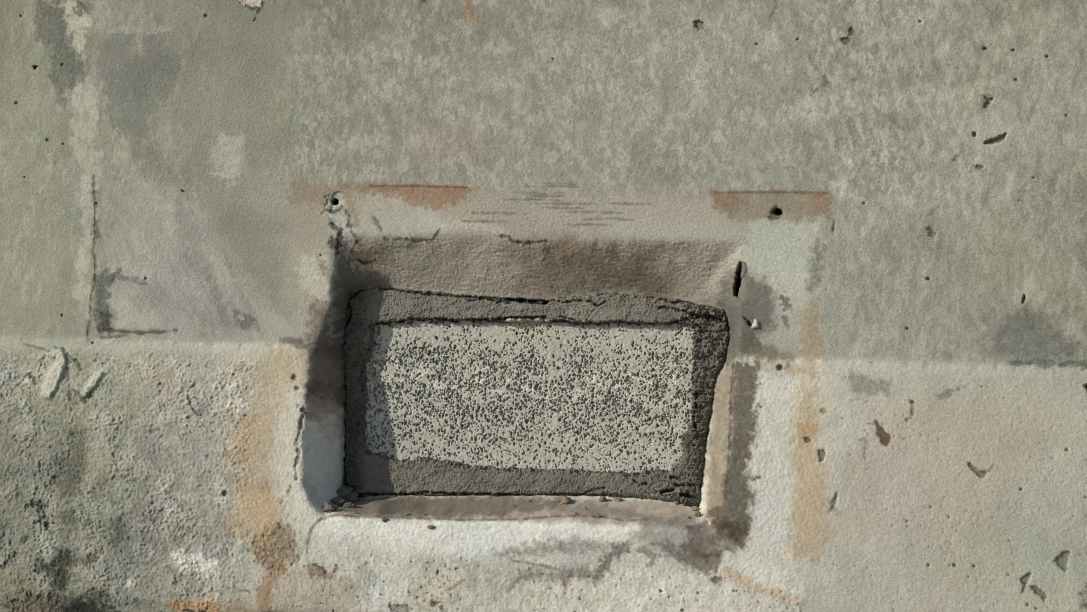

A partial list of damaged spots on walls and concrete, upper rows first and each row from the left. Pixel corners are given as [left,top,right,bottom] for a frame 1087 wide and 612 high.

corrosion [344,184,470,209]
corrosion [710,190,831,221]
leakage [340,272,791,588]
leakage [34,549,120,612]